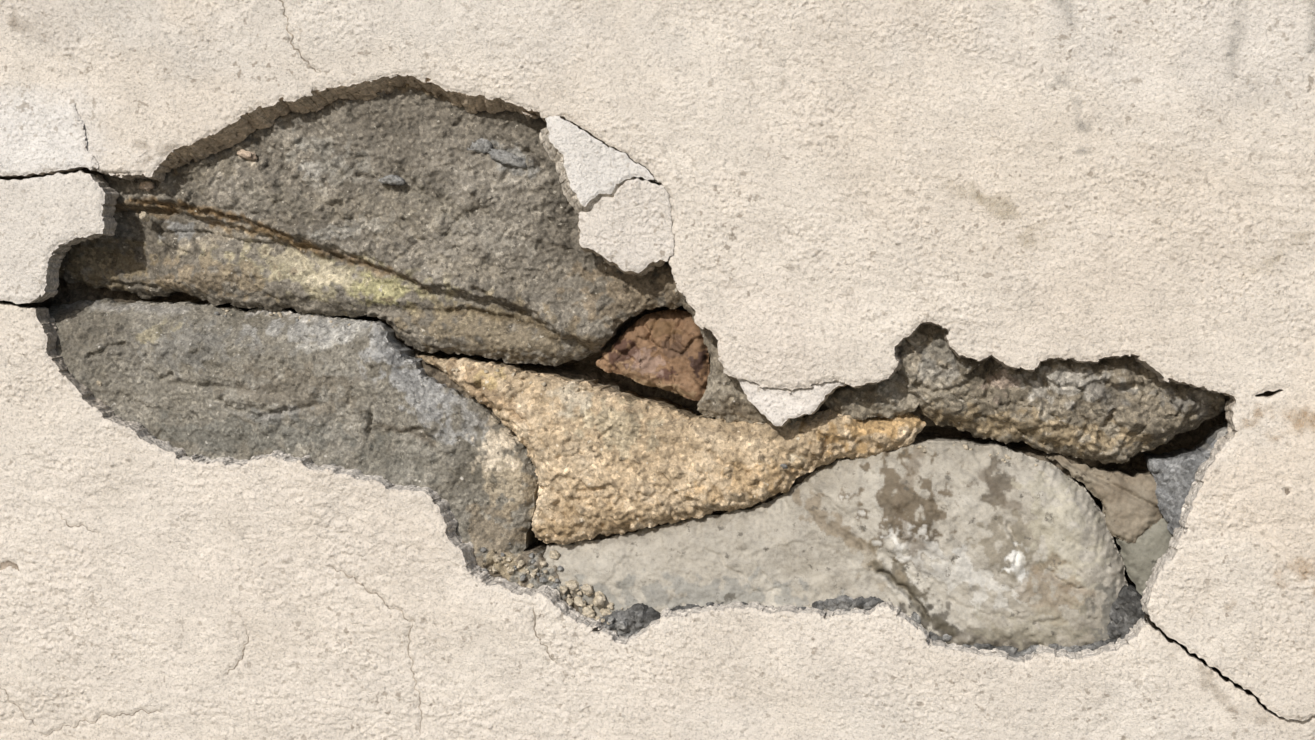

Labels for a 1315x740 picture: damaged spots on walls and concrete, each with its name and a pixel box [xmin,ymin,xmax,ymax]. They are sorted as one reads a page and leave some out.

crack [0,168,99,180]
crack [3,300,40,308]
spalling [0,74,1237,682]
crack [1255,389,1281,397]
crack [1144,614,1277,715]